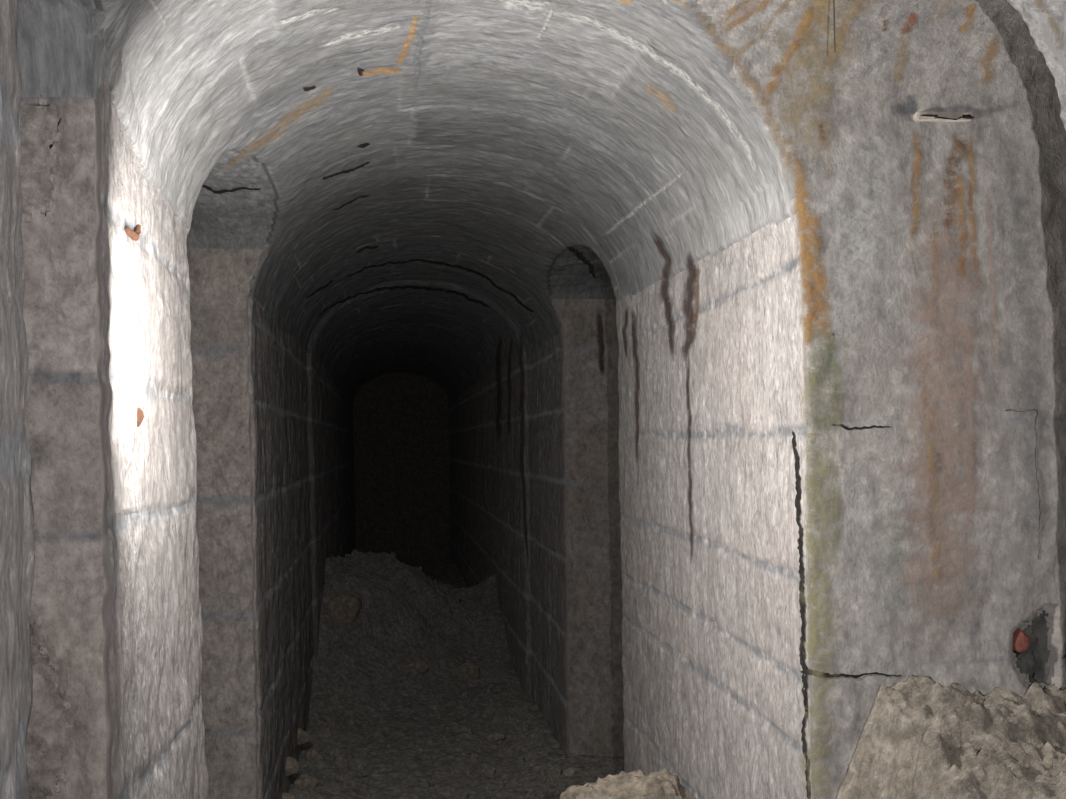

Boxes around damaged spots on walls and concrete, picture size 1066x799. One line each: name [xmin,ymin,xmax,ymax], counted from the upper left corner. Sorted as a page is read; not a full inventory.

corrosion [748,0,859,144]
corrosion [788,157,828,342]
corrosion [944,137,978,274]
crack [832,423,891,431]
crack [792,431,901,799]